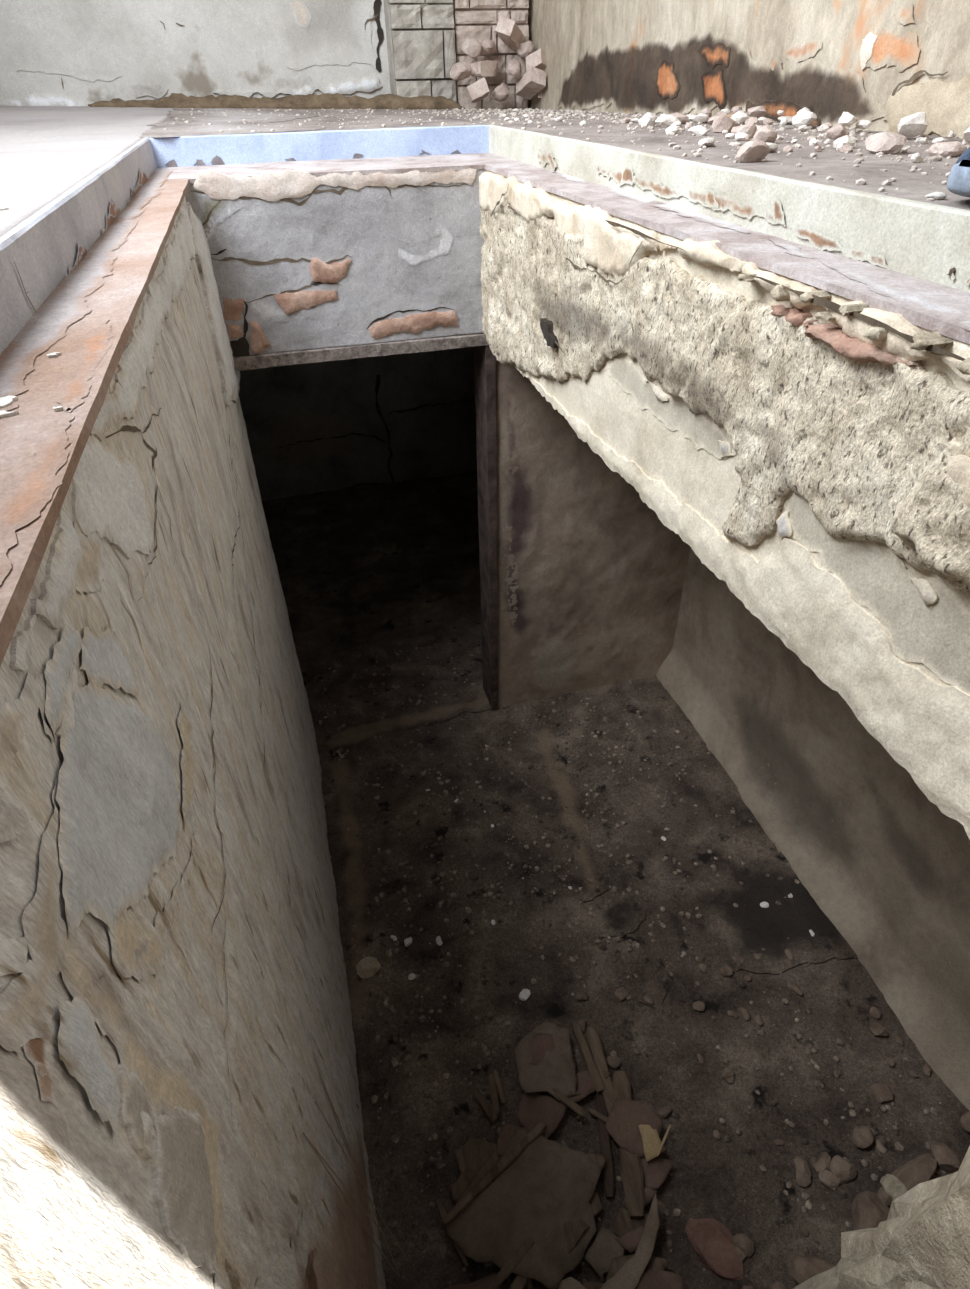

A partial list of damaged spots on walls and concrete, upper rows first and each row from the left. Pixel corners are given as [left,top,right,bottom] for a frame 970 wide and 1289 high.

crack [365,0,384,72]
corrosion [101,169,147,234]
corrosion [0,318,115,585]
crack [267,375,471,489]
damp [497,383,578,696]
spalling [185,168,970,839]